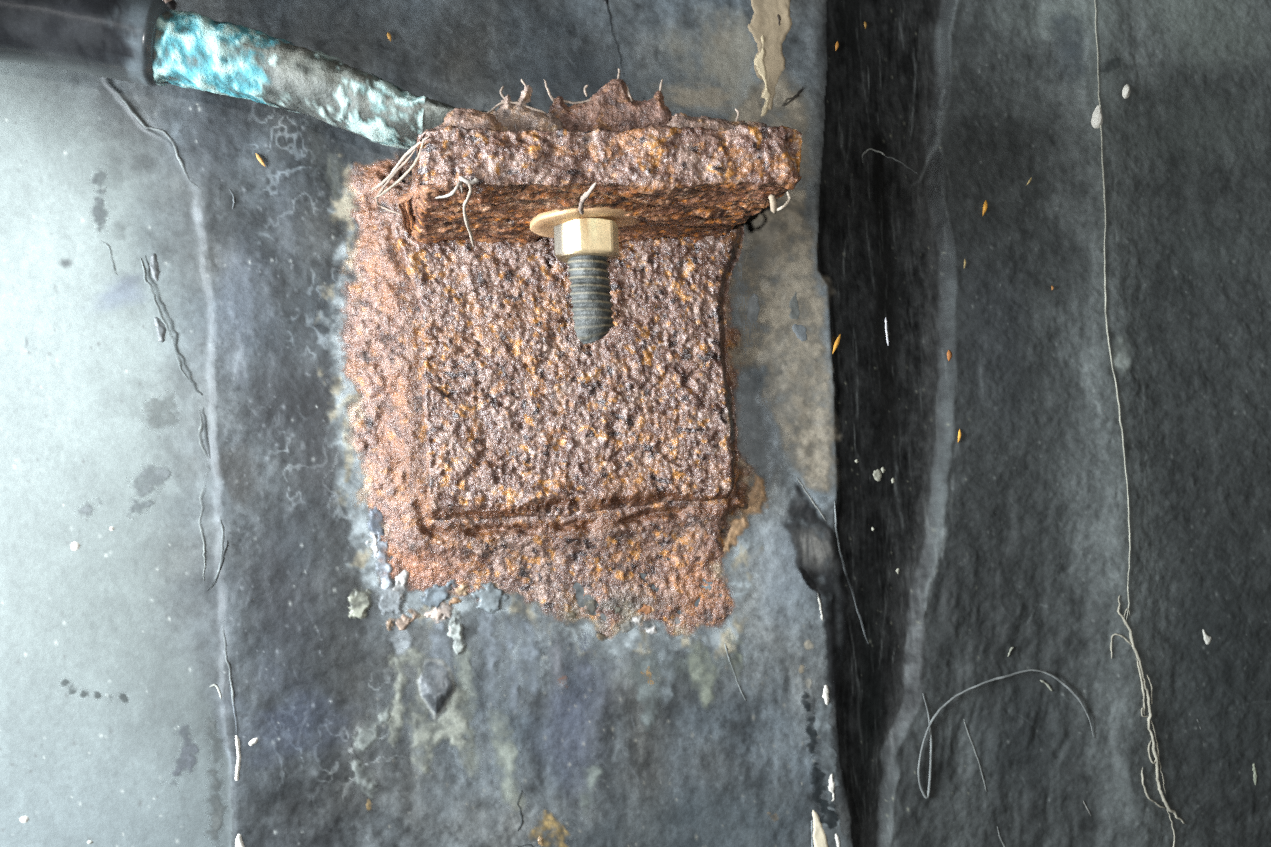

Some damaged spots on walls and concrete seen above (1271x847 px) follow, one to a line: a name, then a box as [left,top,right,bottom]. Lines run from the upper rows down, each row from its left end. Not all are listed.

peeling [789,292,807,341]
rust [326,165,479,630]
rust [722,476,767,599]
leakage [391,612,410,655]
leakage [430,611,565,711]
rust [494,597,541,619]
rust [560,598,742,658]
leakage [637,634,673,726]
leakage [689,644,715,706]
leakage [493,724,521,806]
leakage [582,767,601,805]